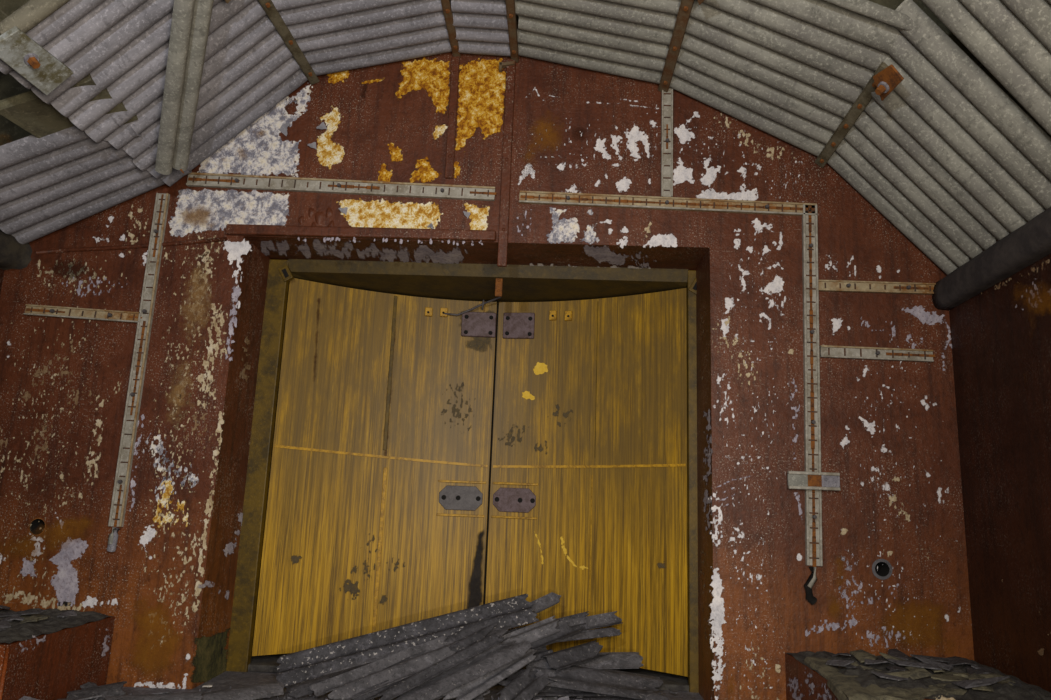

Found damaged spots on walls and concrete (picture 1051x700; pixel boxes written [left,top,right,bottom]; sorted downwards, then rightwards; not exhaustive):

peeling [197,84,345,177]
peeling [327,70,350,84]
peeling [378,143,403,182]
peeling [395,57,506,183]
peeling [518,113,658,192]
peeling [673,111,802,202]
corrosion [183,208,209,224]
peeling [546,207,678,269]
peeling [0,319,121,612]
peeling [129,189,490,644]
spalling [703,218,969,700]
corrosion [135,609,175,670]